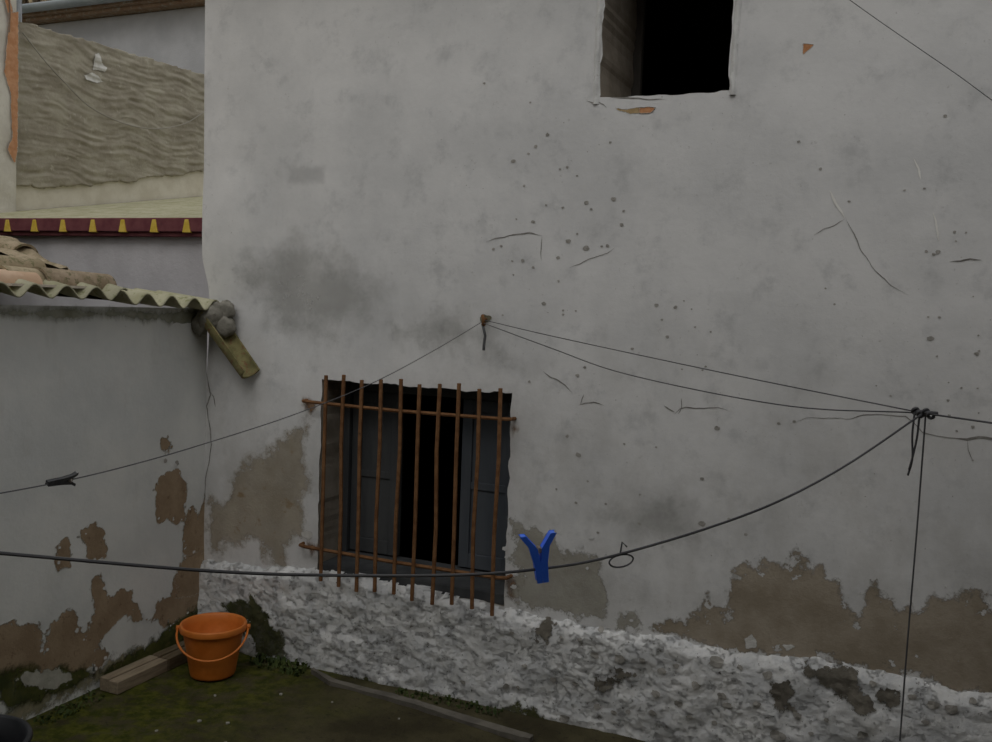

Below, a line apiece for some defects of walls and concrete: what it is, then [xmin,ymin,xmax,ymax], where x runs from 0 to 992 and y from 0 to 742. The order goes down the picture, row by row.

crack [816,190,897,289]
crack [799,414,992,458]
peeling [0,435,205,690]
flaking render [502,518,608,645]
flaking render [594,655,637,692]
flaking render [617,611,640,630]
flaking render [652,544,992,739]